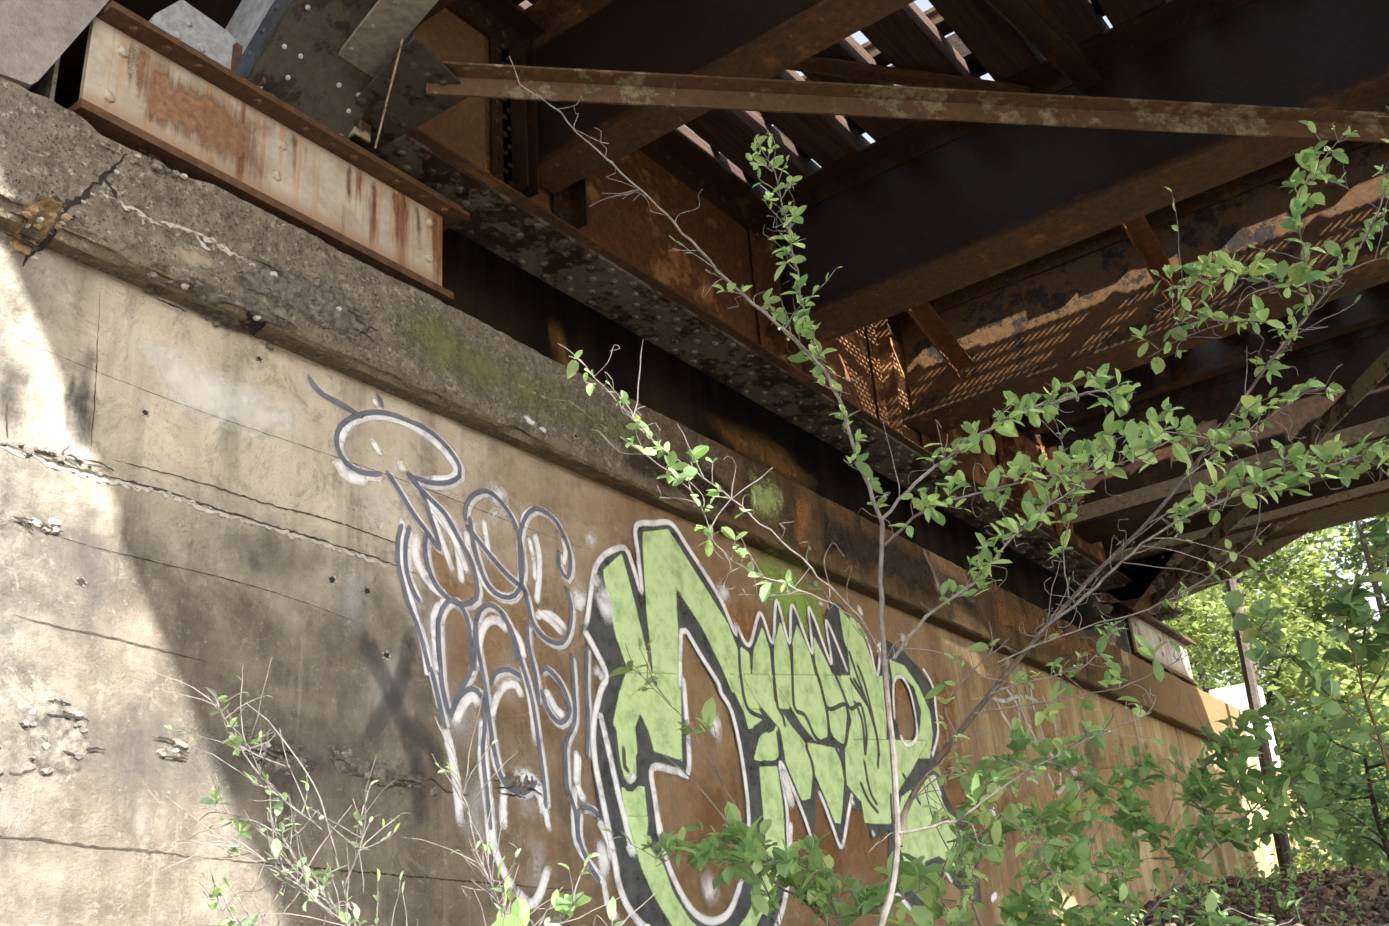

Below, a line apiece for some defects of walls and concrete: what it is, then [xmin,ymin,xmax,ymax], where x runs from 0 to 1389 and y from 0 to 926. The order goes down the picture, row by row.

rust [128,43,265,175]
spalling [4,193,70,255]
crack [22,153,255,268]
rust [347,167,436,231]
crack [0,299,590,573]
damp [407,317,735,513]
rust [720,426,805,481]
damp [752,479,781,514]
crack [13,522,363,625]
spalling [19,698,106,775]
crack [0,836,571,890]